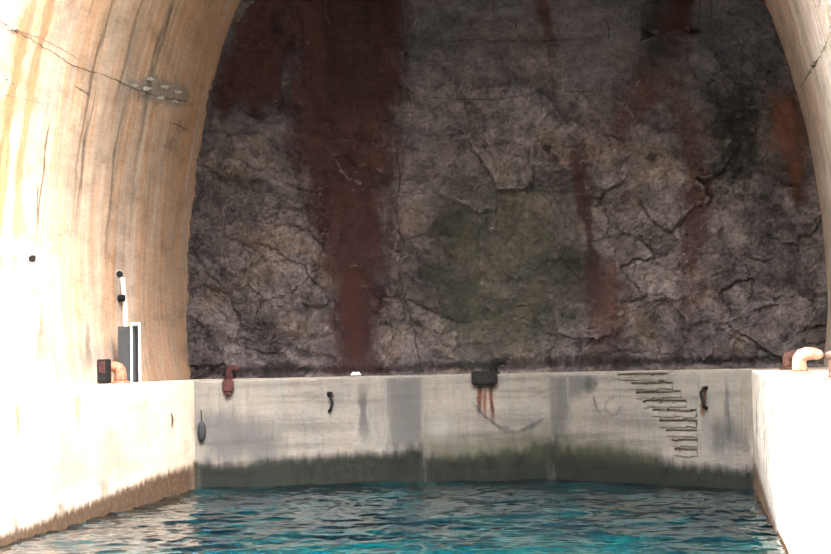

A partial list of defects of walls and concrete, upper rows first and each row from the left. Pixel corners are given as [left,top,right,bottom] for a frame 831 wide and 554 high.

crack [0,21,190,102]
spalling [128,75,190,106]
crack [390,140,448,373]
crack [583,216,668,246]
crack [236,265,321,325]
rust [477,387,494,415]
water stain [425,443,776,532]